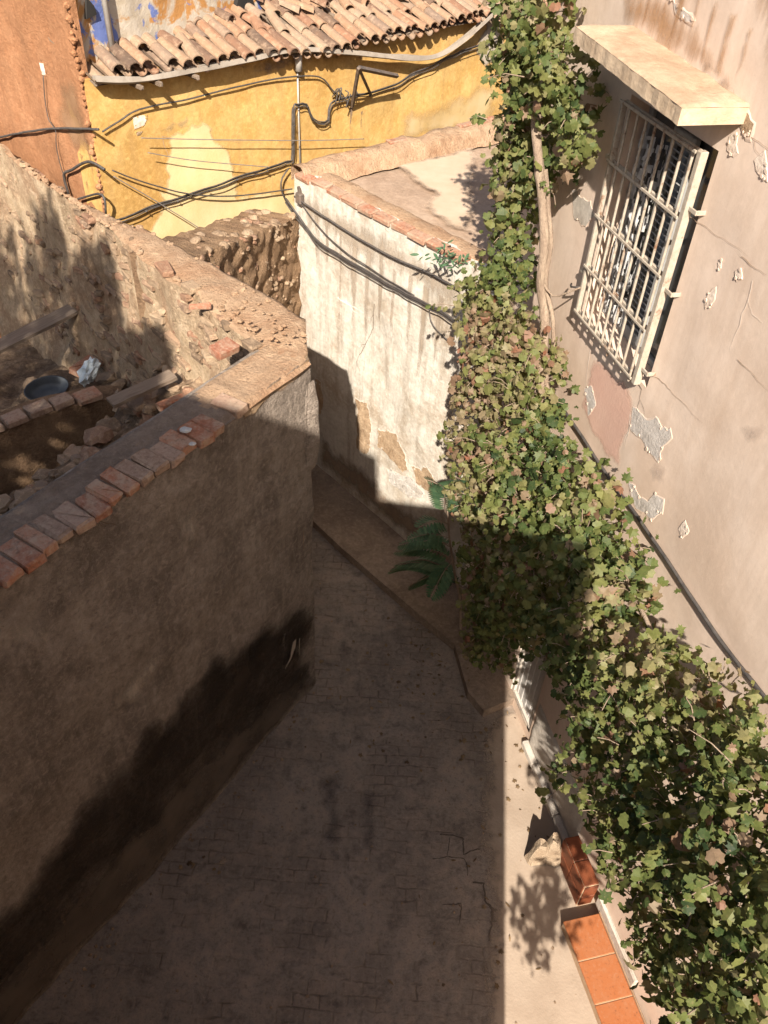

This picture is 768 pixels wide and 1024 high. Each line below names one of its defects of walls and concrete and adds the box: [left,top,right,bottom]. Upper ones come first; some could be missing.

spalling [670,0,696,27]
spalling [727,109,756,158]
peeling [584,385,596,416]
peeling [355,398,439,500]
peeling [630,407,673,463]
peeling [629,483,665,522]
peeling [678,520,689,539]